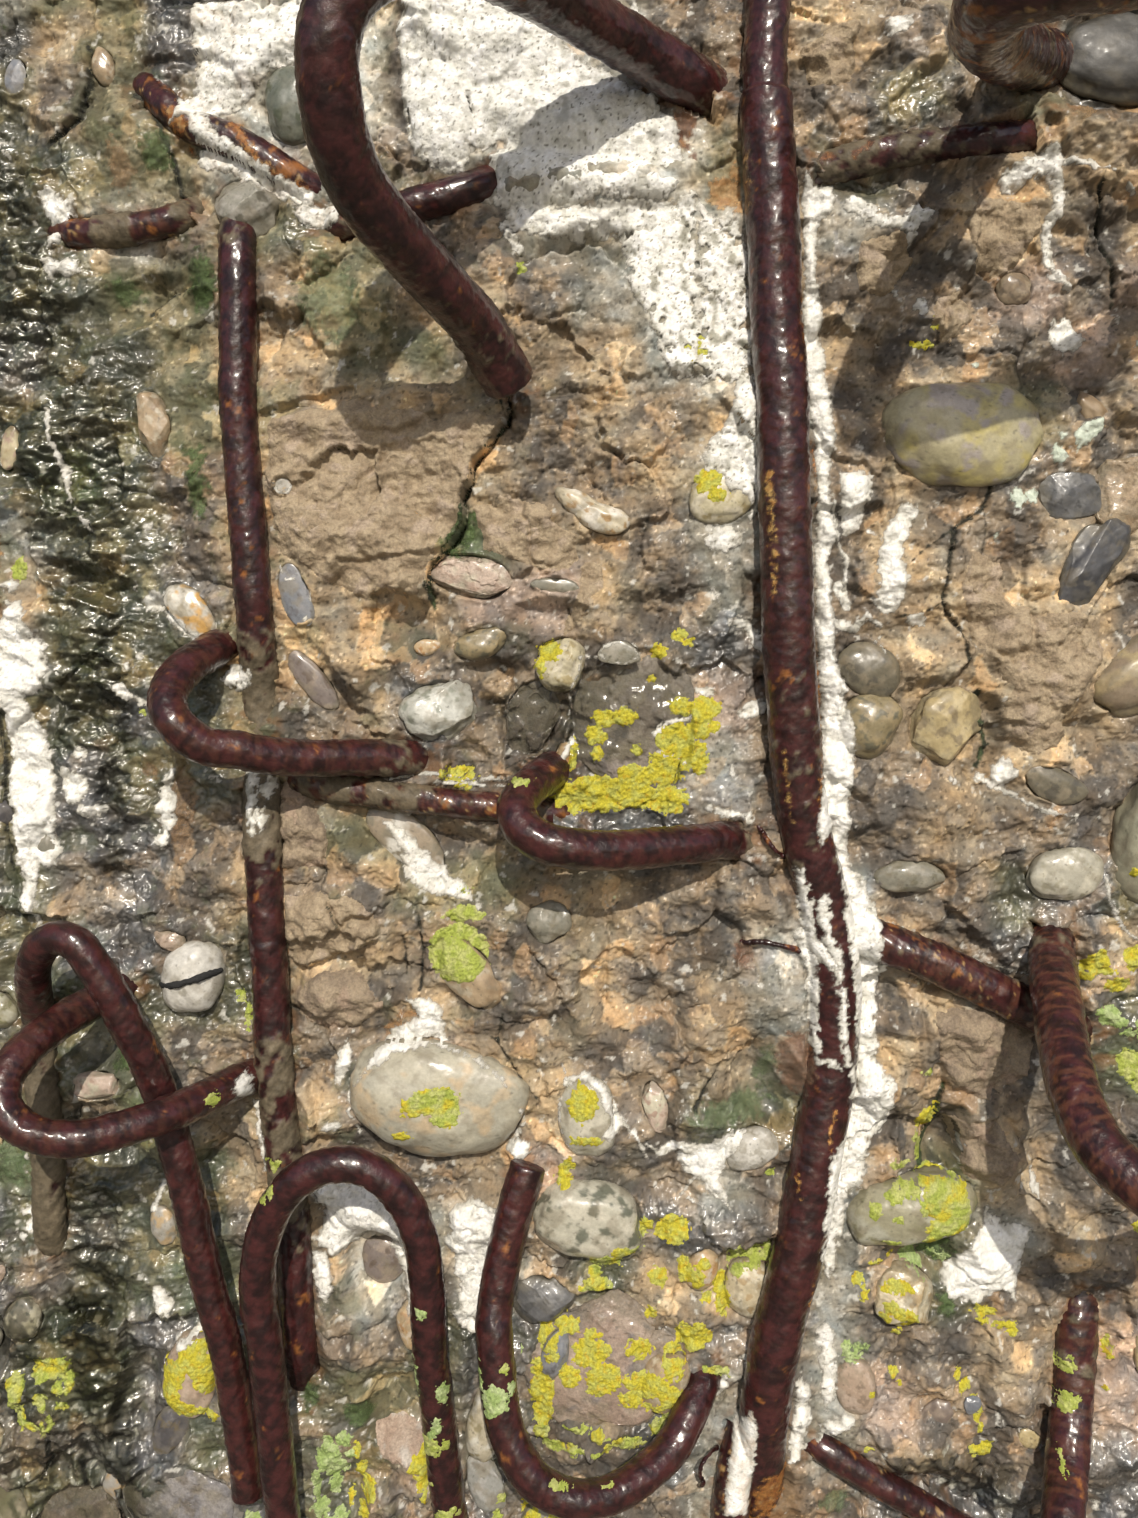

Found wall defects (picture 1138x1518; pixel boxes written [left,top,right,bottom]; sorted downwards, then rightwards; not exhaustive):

damp [168,0,339,229]
corrosion [675,107,697,160]
damp [396,0,758,553]
crack [422,396,513,610]
corrosion [765,471,776,532]
damp [0,579,108,926]
damp [112,653,147,707]
corrosion [171,769,197,846]
damp [793,171,935,1279]
corrosion [773,1031,816,1094]
damp [787,1323,855,1464]
corrosion [749,1462,786,1518]